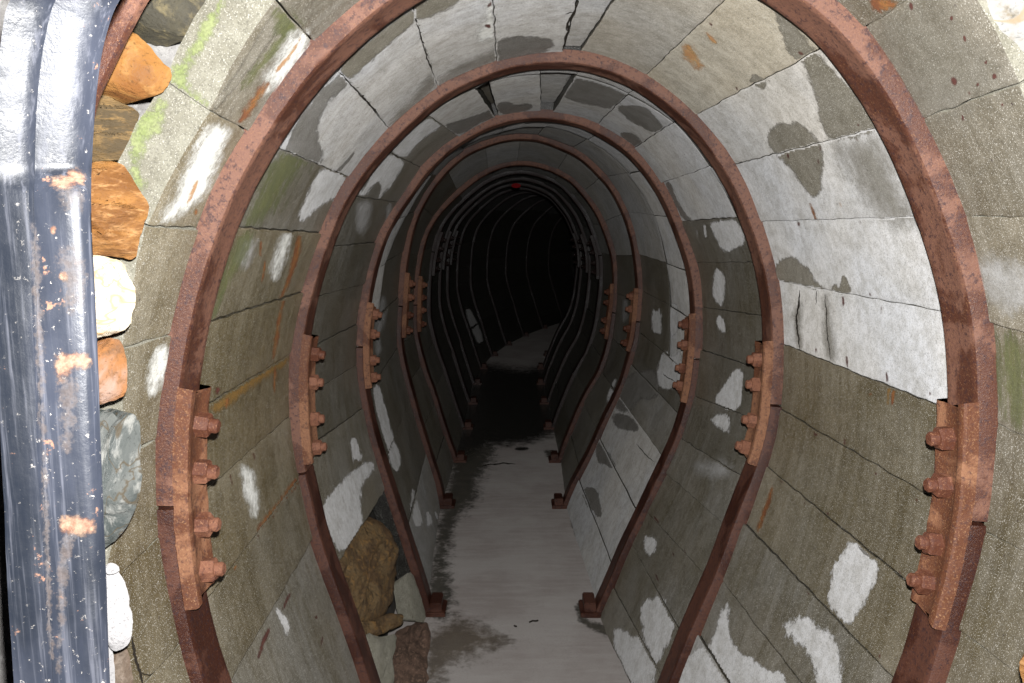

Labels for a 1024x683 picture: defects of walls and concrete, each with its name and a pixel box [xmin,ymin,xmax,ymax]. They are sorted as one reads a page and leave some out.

crack [562,1,579,50]
rust [684,45,703,67]
damp [565,76,663,146]
damp [768,11,900,215]
damp [776,256,851,293]
rust [213,236,301,412]
crack [795,291,831,360]